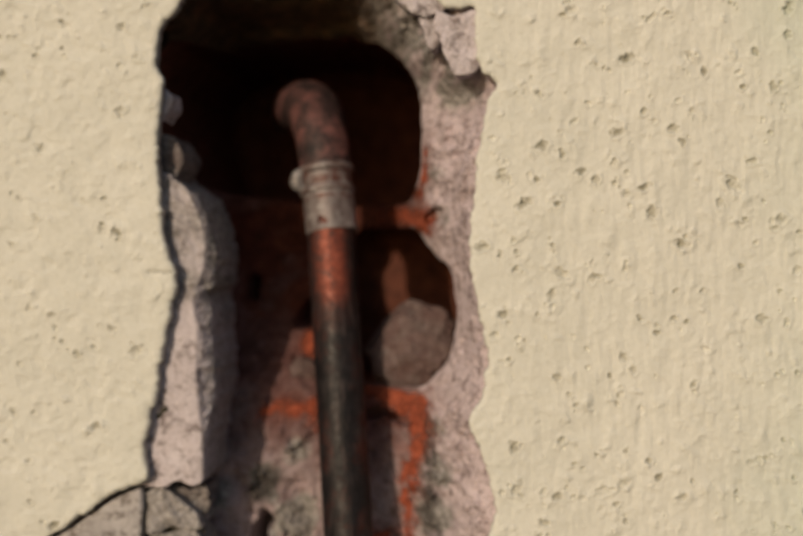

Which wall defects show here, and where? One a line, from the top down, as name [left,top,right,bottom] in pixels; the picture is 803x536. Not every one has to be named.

spalling [161,0,497,536]
peeling [51,134,324,536]
corrosion [303,331,314,360]
corrosion [259,397,318,431]
crack [146,489,181,536]